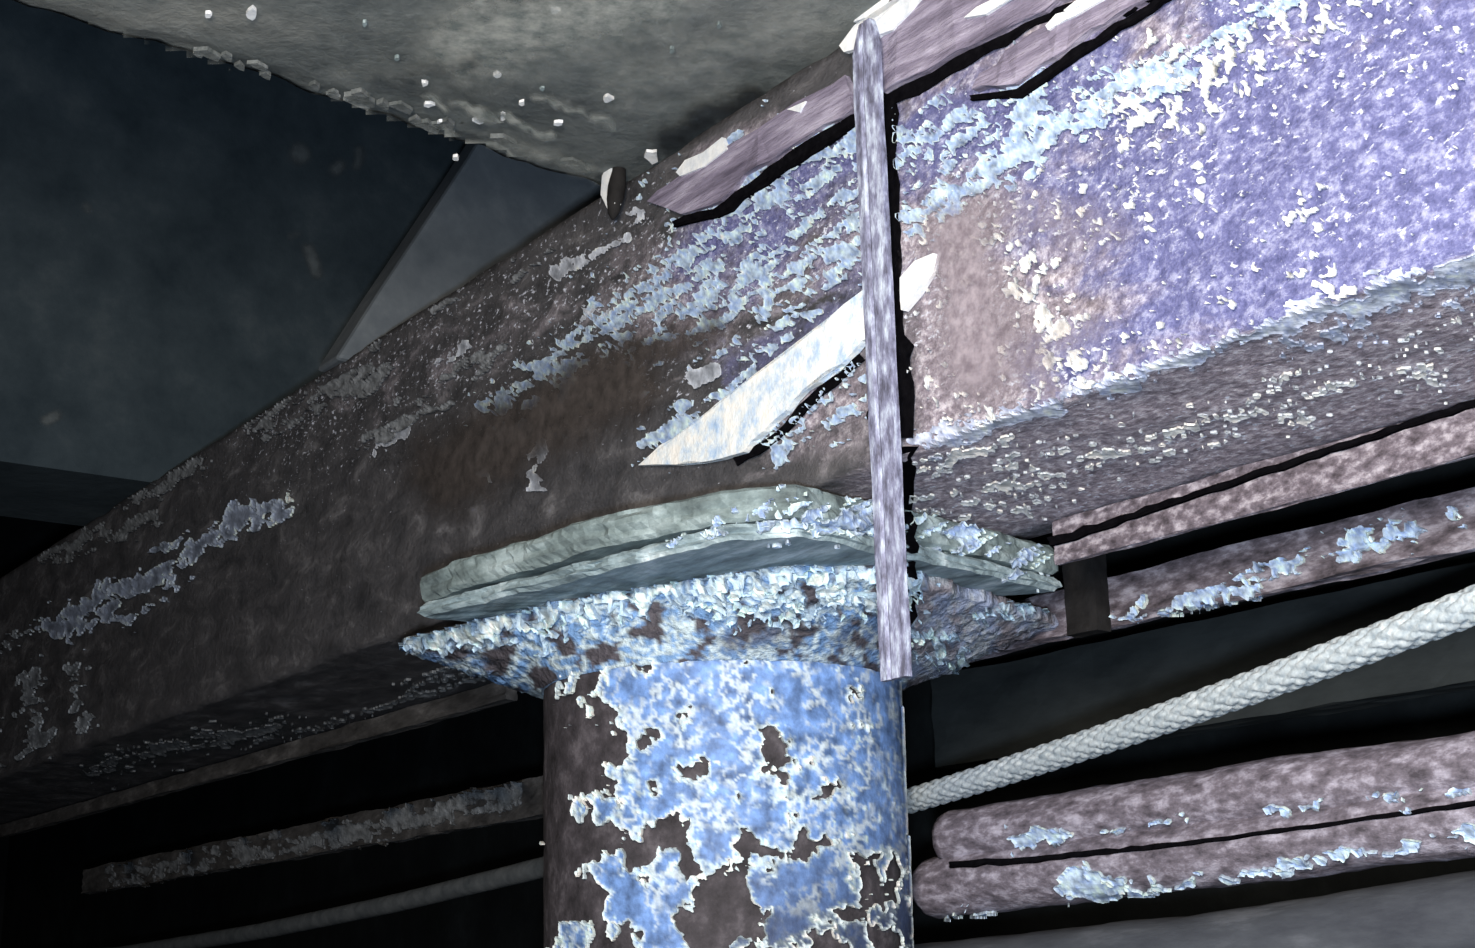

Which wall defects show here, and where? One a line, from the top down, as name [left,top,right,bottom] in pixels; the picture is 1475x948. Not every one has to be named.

spalling [193,46,271,80]
spalling [309,80,455,135]
peeling [355,75,874,549]
peeling [839,0,1475,627]
peeling [0,456,295,767]
peeling [906,562,975,675]
peeling [79,564,877,790]
peeling [548,659,914,948]
peeling [944,904,998,922]
peeling [1004,824,1074,858]
peeling [1053,822,1475,907]
peeling [1262,798,1323,819]